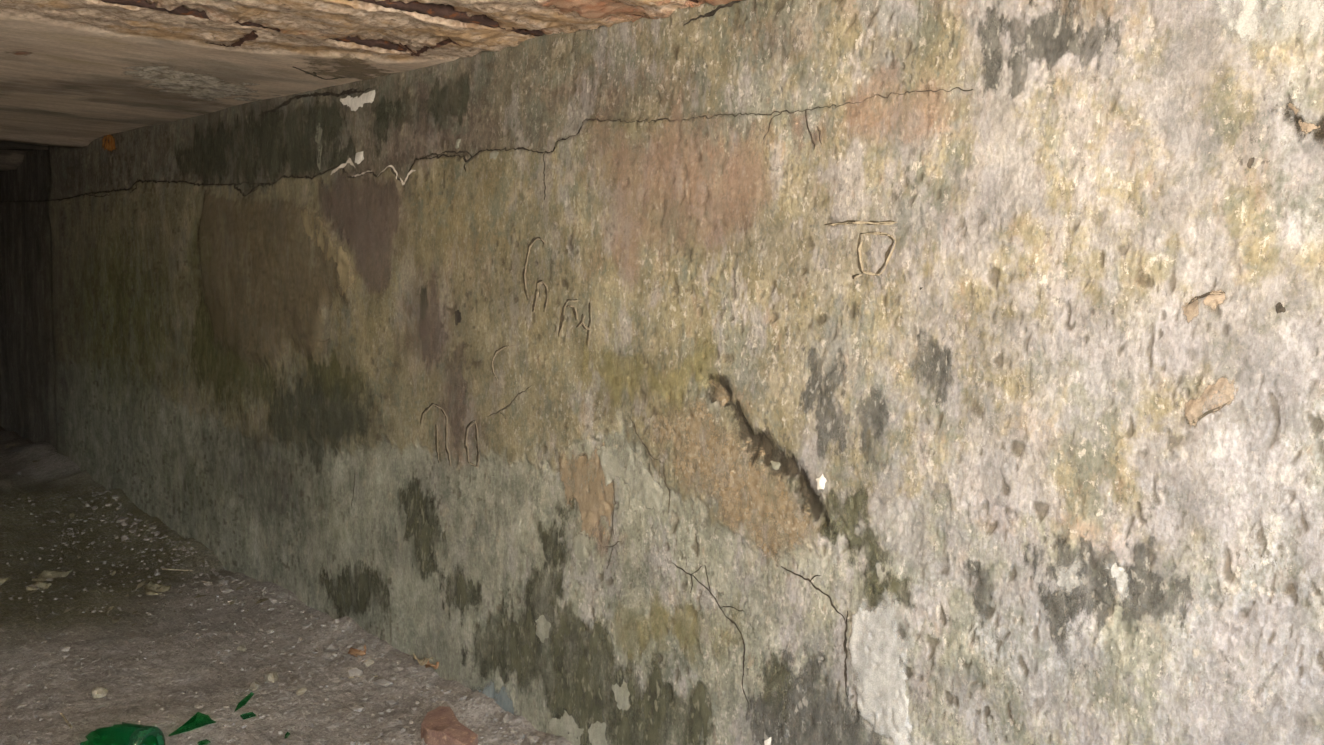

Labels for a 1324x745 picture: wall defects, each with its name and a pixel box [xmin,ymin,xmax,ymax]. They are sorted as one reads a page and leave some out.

spalling [101,0,210,20]
spalling [234,21,280,32]
spalling [329,36,407,52]
spalling [348,0,544,36]
spalling [543,0,670,22]
crack [259,67,372,116]
crack [0,87,973,203]
water stain [538,443,615,567]
water stain [395,474,482,625]
mould [820,487,911,611]
mould [746,650,881,745]